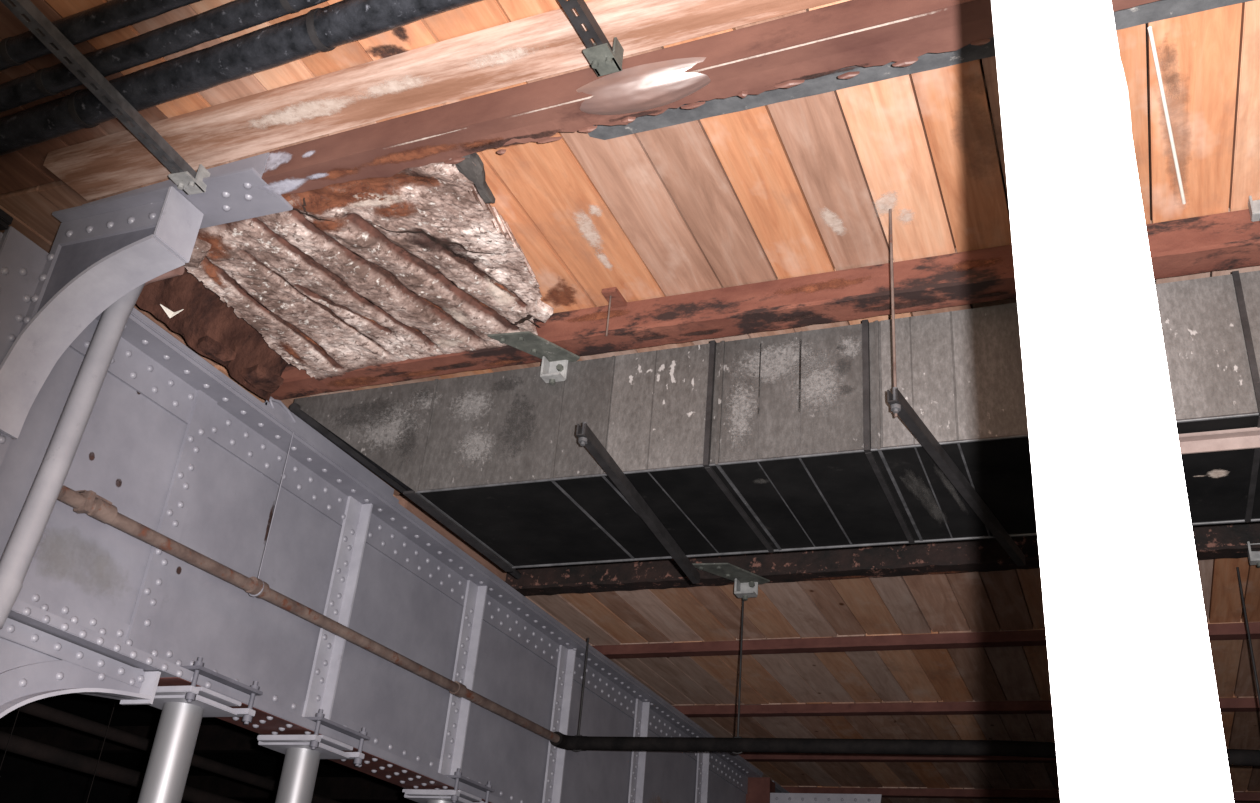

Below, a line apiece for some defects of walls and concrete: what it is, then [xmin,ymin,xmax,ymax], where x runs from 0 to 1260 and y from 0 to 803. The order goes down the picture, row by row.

peeling [261,151,327,197]
peeling [455,152,495,204]
peeling [526,299,554,323]
water stain [866,299,945,312]